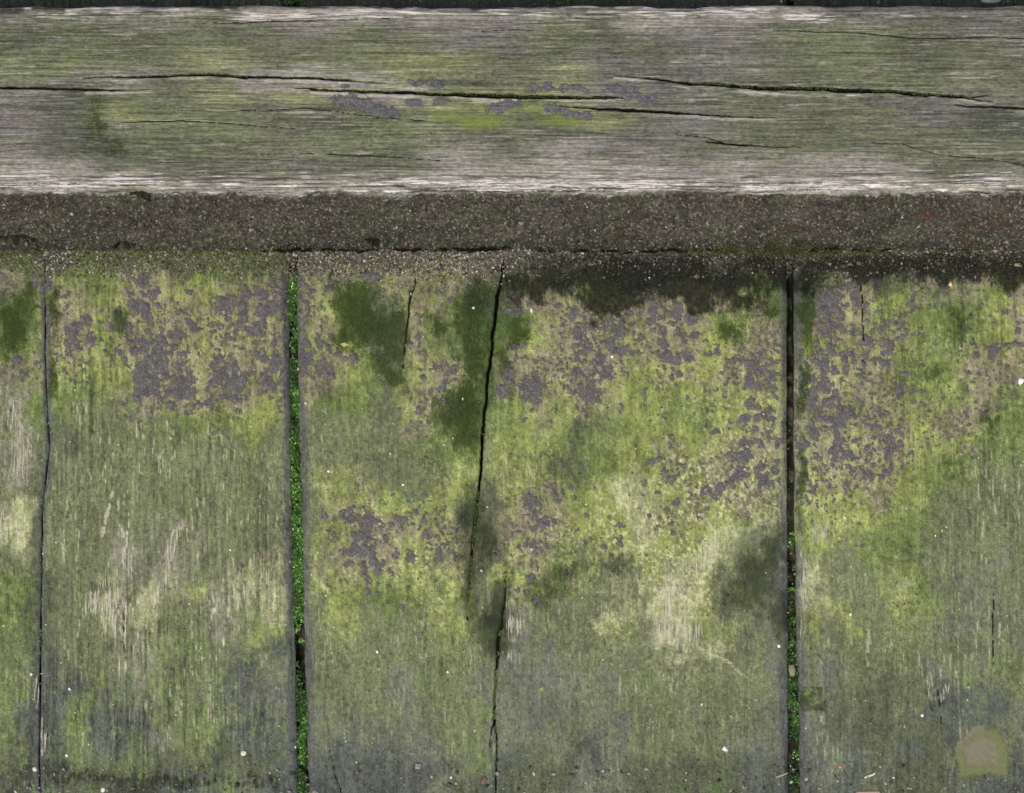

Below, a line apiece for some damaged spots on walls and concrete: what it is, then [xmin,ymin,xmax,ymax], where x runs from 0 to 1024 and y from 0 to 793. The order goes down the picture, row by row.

crack [0,73,1024,148]
damp [501,249,1024,326]
crack [260,246,723,625]
crack [489,576,507,793]